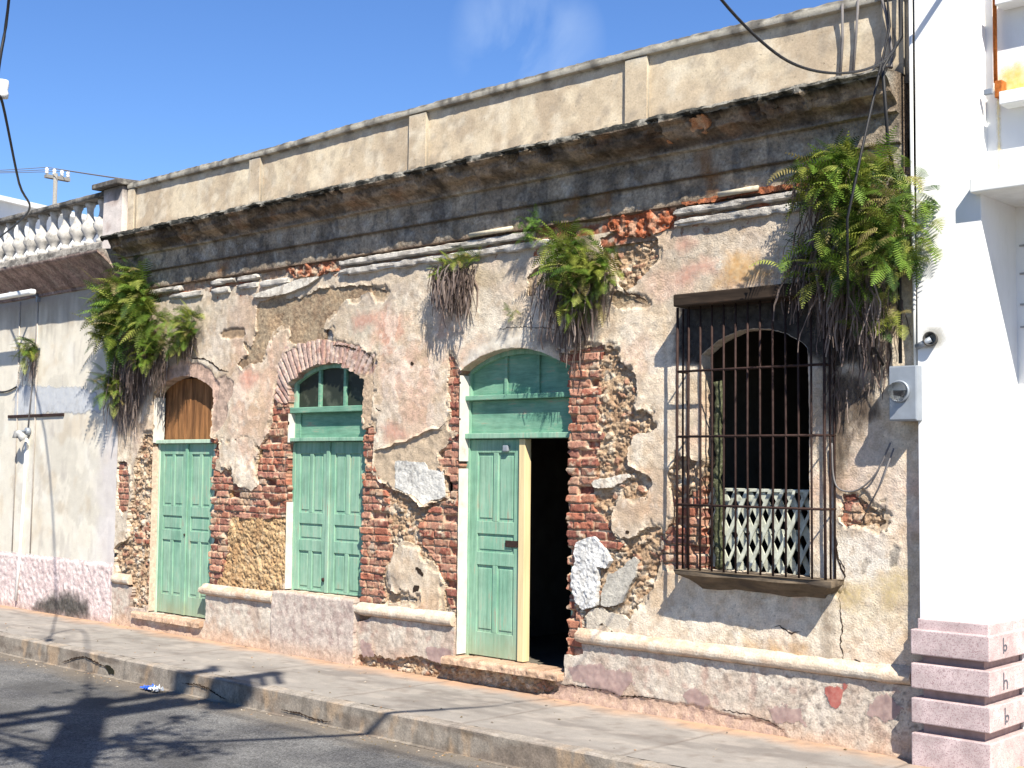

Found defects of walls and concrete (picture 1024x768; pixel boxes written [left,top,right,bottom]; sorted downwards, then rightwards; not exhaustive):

spalling [116,433,165,608]
spalling [208,285,470,621]
spalling [561,345,716,656]
crack [836,538,860,662]
spalling [840,493,886,529]